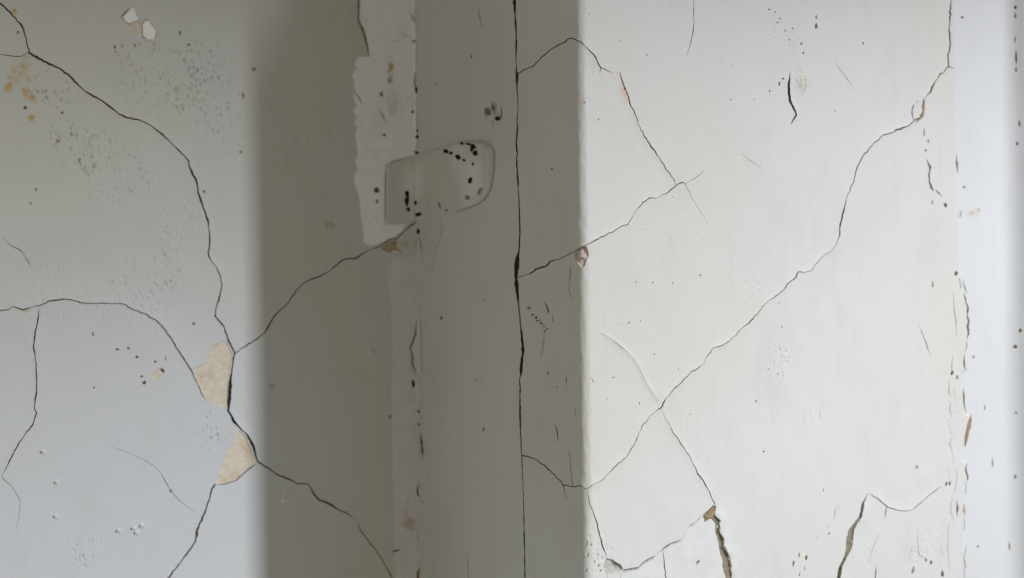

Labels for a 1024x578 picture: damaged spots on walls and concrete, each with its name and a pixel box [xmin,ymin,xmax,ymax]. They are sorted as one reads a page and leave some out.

spalling [120,7,157,40]
peeling [352,0,419,253]
leakage [443,142,477,184]
leakage [483,99,504,128]
crack [0,3,443,578]
crack [519,0,961,558]
flaking render [0,298,233,409]
flaking render [215,429,258,485]
crack [920,271,970,578]
peeling [603,505,732,578]